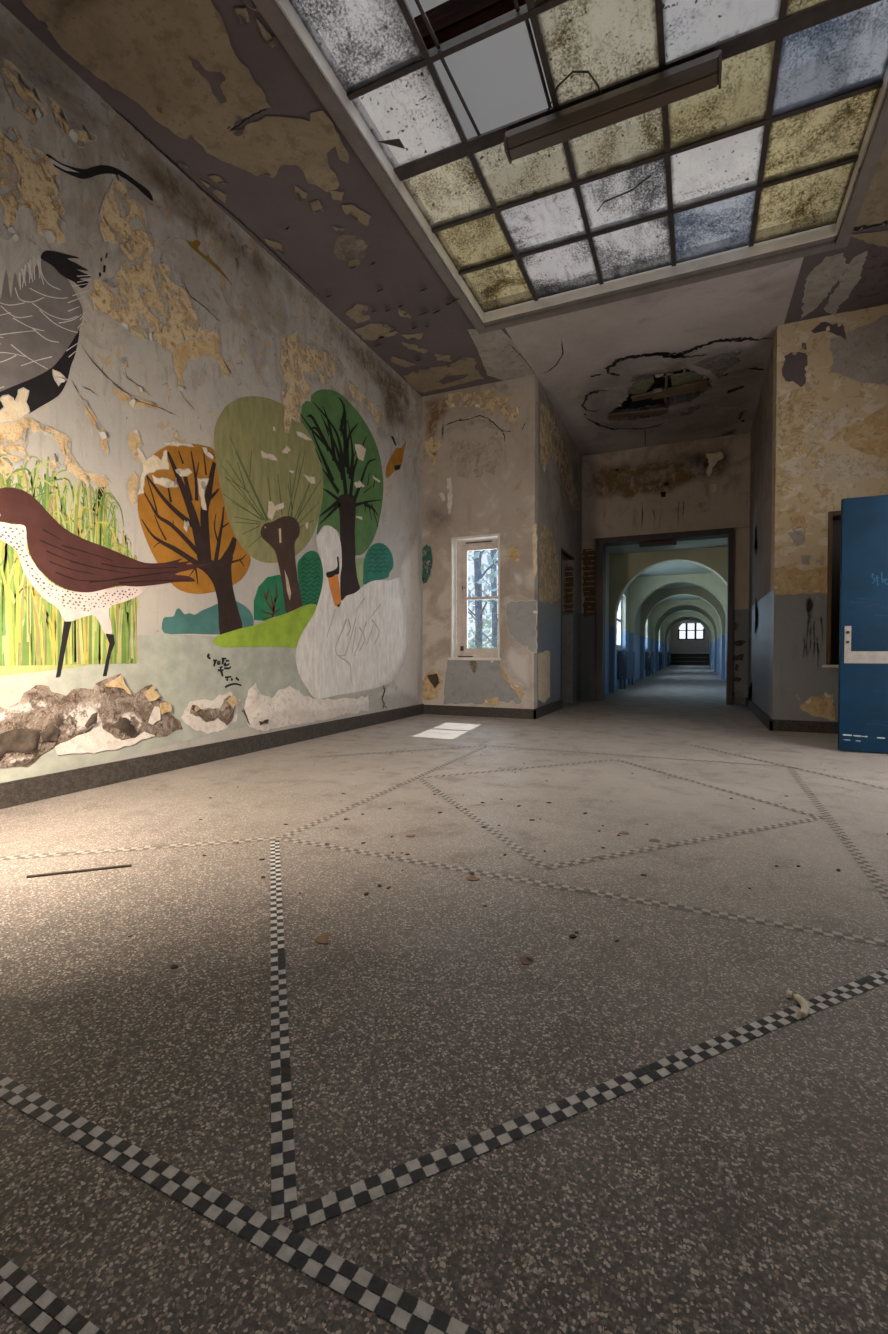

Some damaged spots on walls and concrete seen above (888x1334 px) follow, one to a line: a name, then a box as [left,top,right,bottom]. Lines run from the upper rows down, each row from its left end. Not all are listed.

peeling [0,57,97,245]
peeling [20,0,371,235]
peeling [87,175,231,391]
peeling [345,299,520,423]
crack [512,340,564,374]
crack [581,337,772,445]
peeling [775,138,888,499]
peeling [706,452,723,492]
peeling [773,508,827,595]
flaking render [0,674,240,769]